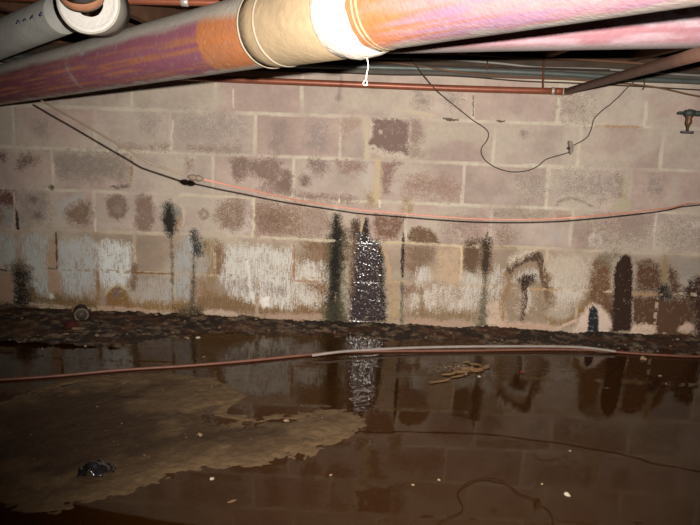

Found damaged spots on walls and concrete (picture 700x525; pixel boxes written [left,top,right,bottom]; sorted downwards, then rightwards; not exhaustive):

leakage [0,87,700,333]